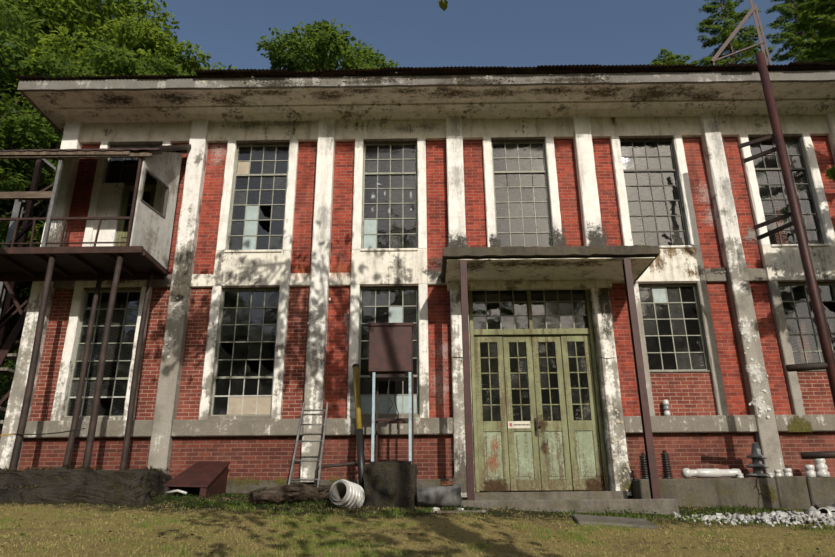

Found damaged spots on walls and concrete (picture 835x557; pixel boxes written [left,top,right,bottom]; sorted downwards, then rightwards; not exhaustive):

water stain [586,221,608,246]
water stain [171,244,193,302]
corrosion [484,442,507,491]